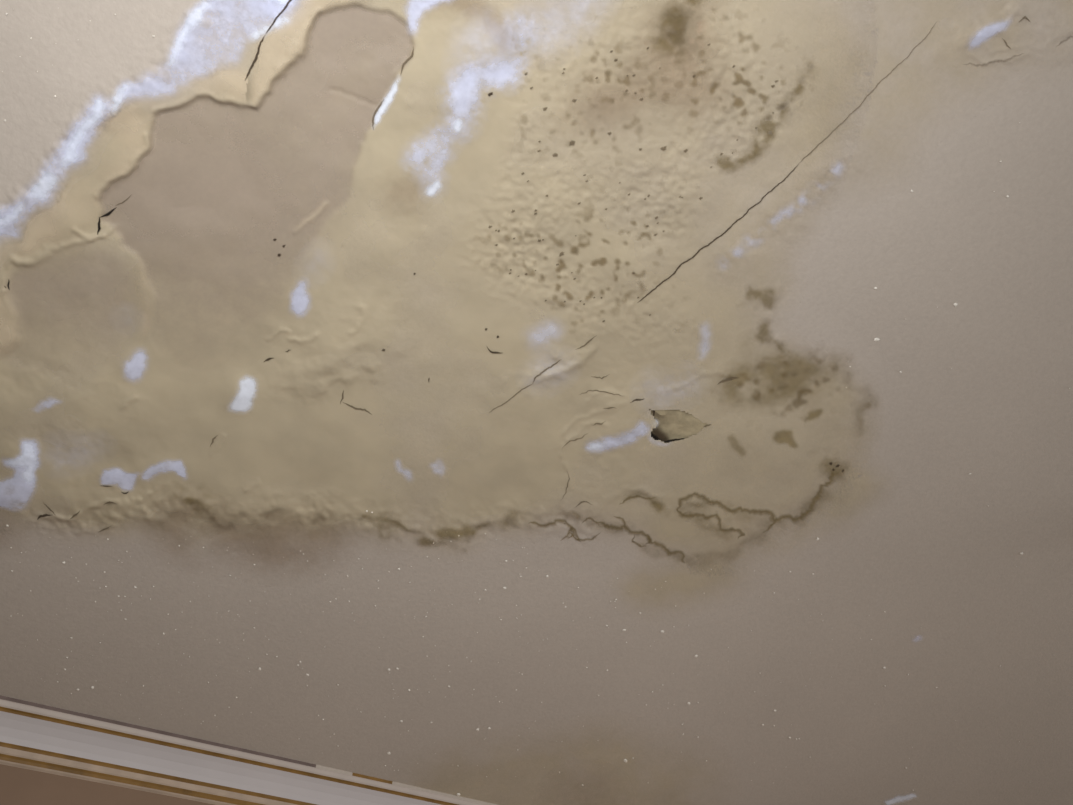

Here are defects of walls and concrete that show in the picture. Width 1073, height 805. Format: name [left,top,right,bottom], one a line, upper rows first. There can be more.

crack [245,0,291,80]
peeling [64,90,129,161]
crack [639,23,936,302]
peeling [128,354,143,378]
peeling [232,379,255,410]
crack [489,335,597,413]
peeling [0,444,37,506]
peeling [103,470,134,489]
damp [677,475,833,538]
damp [531,516,685,563]